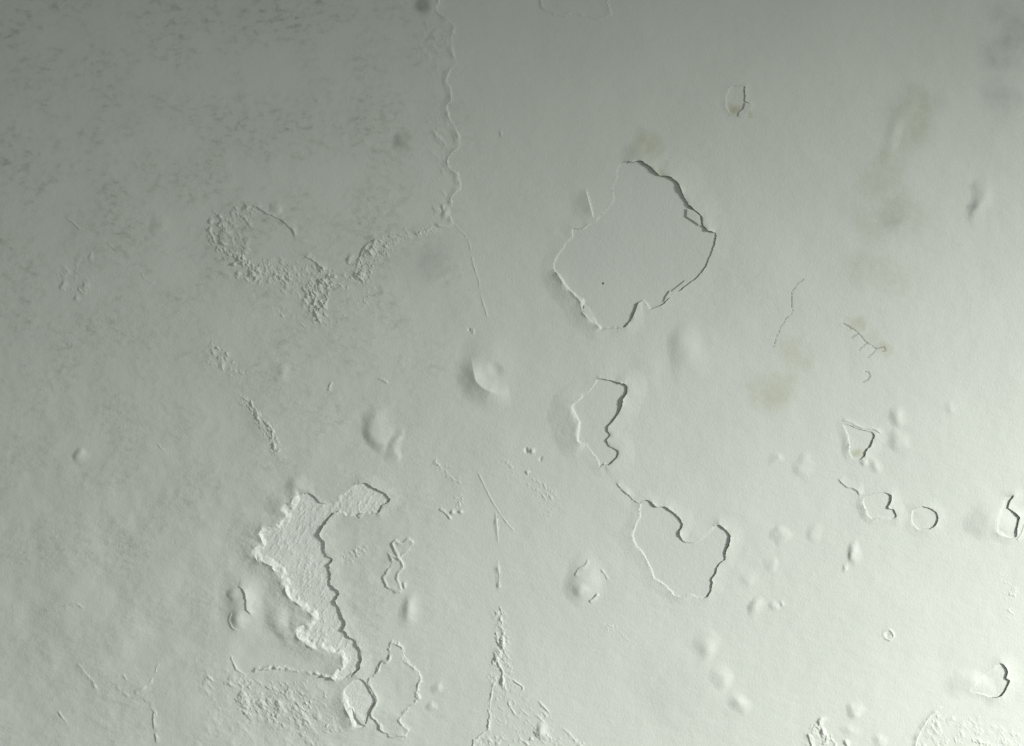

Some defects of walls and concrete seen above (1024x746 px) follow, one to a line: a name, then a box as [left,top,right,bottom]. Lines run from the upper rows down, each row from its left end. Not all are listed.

peeling [723,80,756,122]
peeling [541,140,732,343]
crack [843,323,885,383]
peeling [550,368,743,607]
peeling [237,471,401,735]